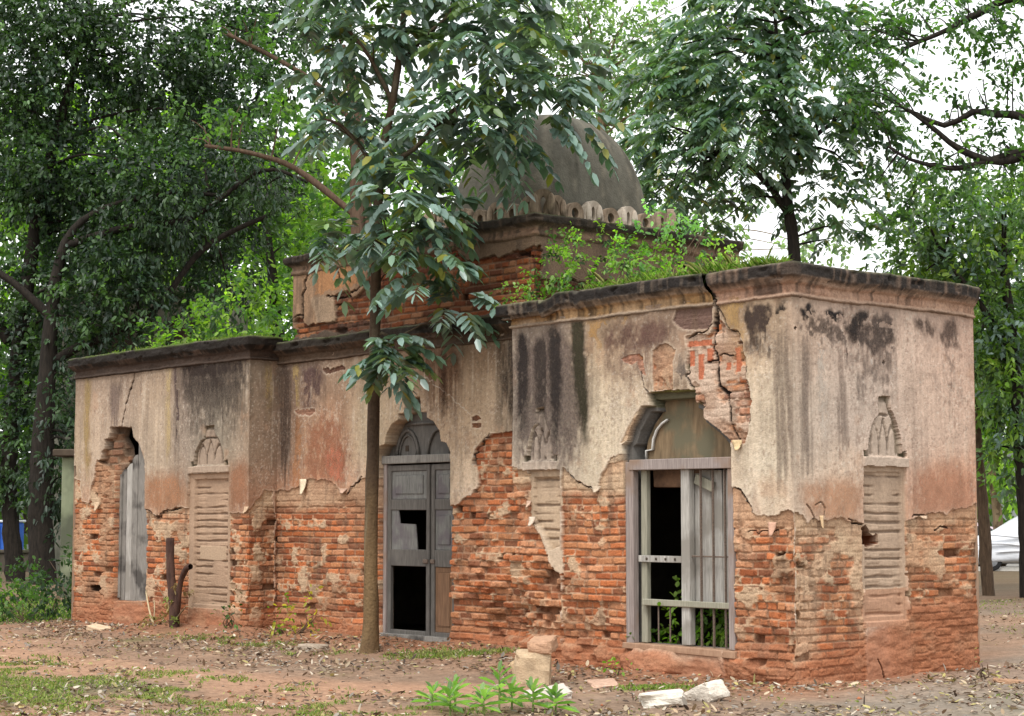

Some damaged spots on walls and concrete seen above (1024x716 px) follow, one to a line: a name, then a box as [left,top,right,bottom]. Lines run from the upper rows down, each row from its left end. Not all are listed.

flaking render [383,254,535,327]
water stain [500,322,587,461]
flaking render [622,343,676,391]
flaking render [675,303,752,450]
crack [687,270,751,439]
water stain [916,319,957,347]
flaking render [72,426,135,623]
flaking render [142,507,190,624]
flaking render [227,478,365,636]
flaking render [449,408,651,670]
flaking render [725,487,868,685]
flaking render [905,504,980,668]